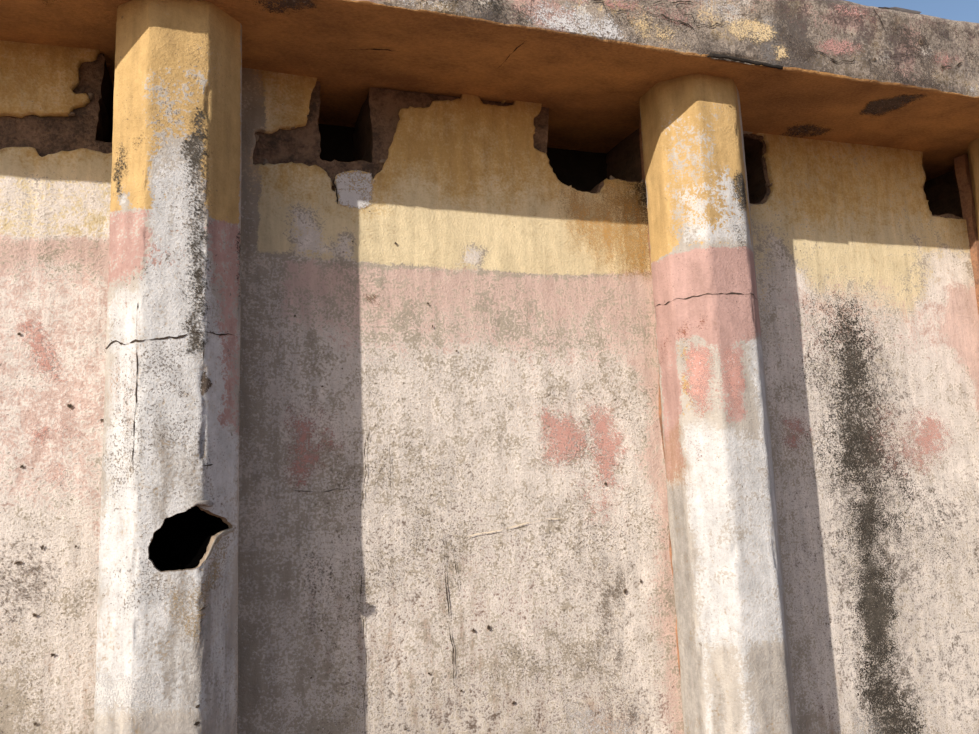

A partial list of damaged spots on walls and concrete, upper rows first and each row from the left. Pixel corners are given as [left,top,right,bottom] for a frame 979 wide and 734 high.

spalling [0,54,112,155]
spalling [253,81,457,212]
spalling [533,108,550,165]
damp [180,107,210,355]
crack [656,292,754,306]
crack [105,304,237,471]
spalling [148,500,234,572]
damp [798,291,969,734]